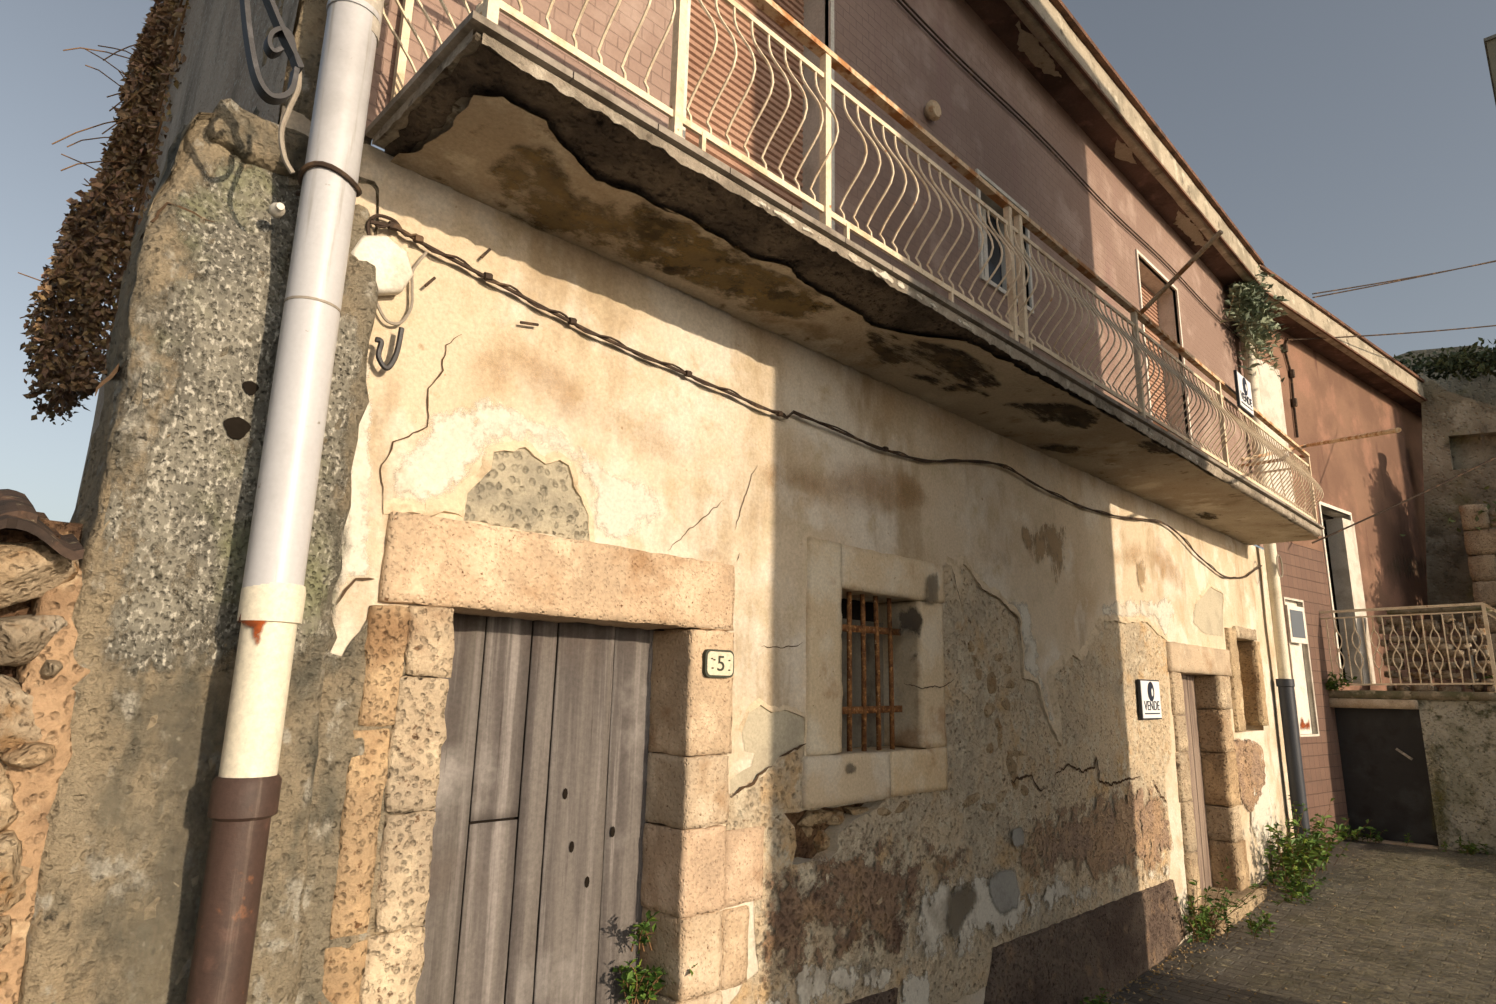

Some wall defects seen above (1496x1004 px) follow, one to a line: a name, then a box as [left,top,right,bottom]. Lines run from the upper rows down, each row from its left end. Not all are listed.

leakage [491,147,832,319]
spalling [372,21,1222,479]
rust [238,614,266,644]
crack [380,336,458,515]
peeling [336,364,595,605]
leakage [1022,524,1064,583]
leakage [1138,560,1146,591]
peeling [726,555,1173,1004]